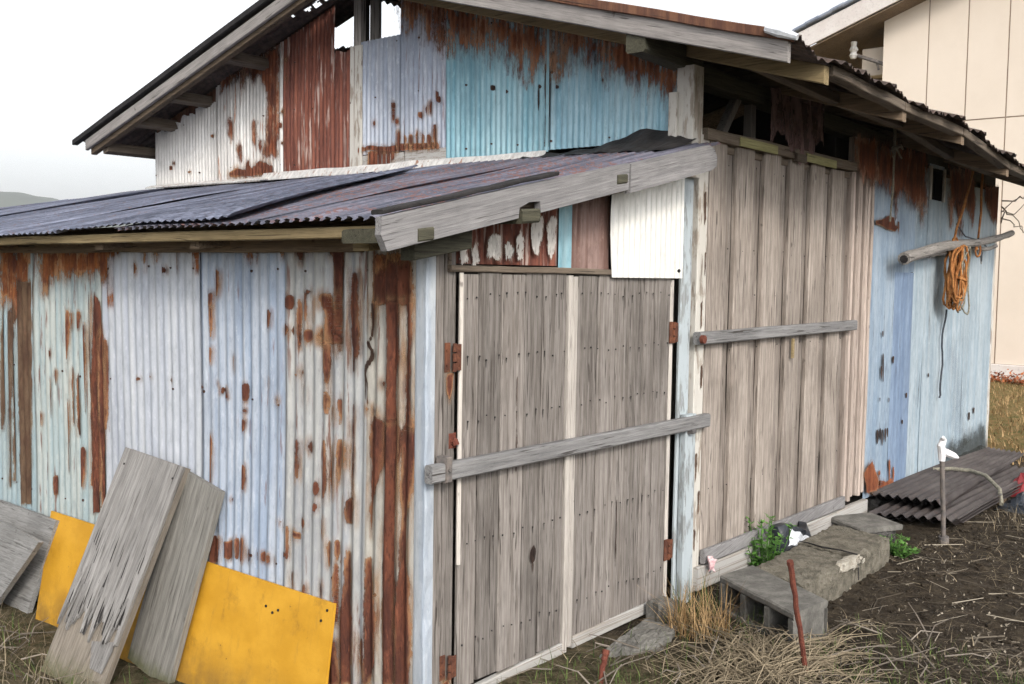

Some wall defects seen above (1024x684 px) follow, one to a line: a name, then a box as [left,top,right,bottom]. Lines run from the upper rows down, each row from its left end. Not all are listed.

corrosion [220,44,280,177]
corrosion [358,91,441,165]
corrosion [397,0,677,147]
corrosion [133,252,177,273]
peeling [459,216,557,265]
corrosion [854,132,930,232]
corrosion [948,164,999,237]
corrosion [0,252,119,513]
corrosion [208,250,415,684]
corrosion [864,460,894,494]